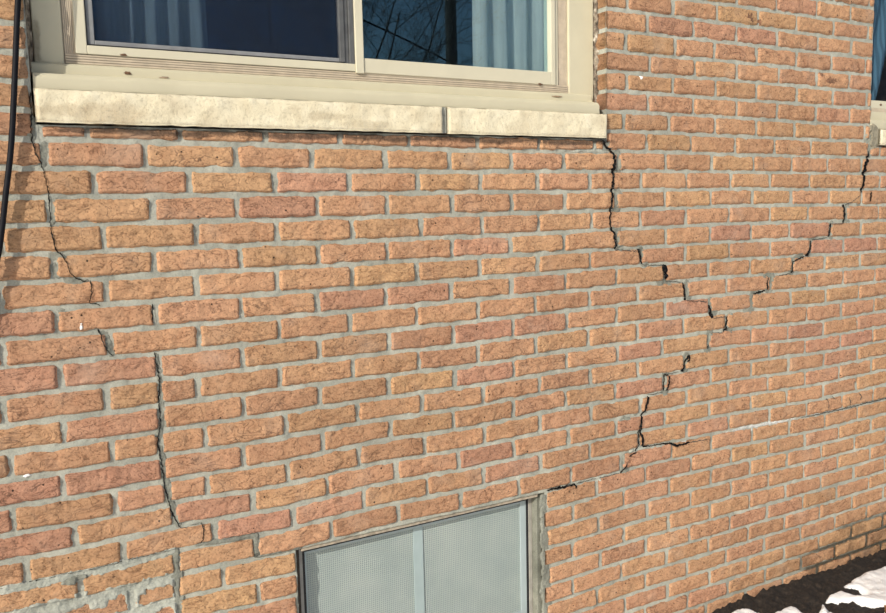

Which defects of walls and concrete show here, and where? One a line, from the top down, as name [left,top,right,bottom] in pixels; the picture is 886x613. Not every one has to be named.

crack [27,92,100,306]
crack [98,329,115,357]
crack [153,352,205,543]
crack [547,133,873,491]
crack [801,393,886,418]